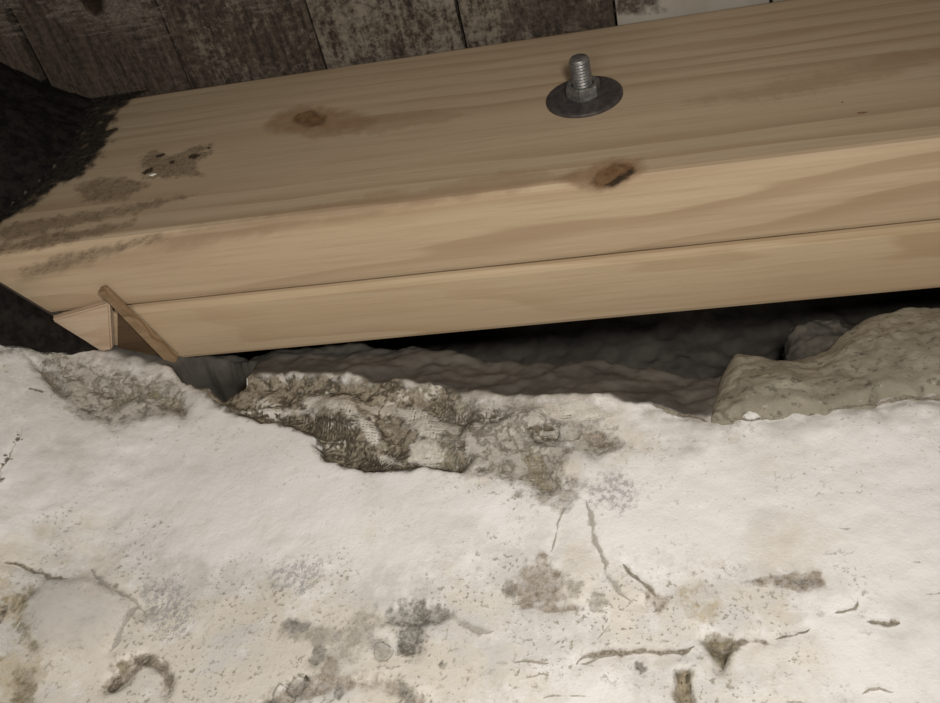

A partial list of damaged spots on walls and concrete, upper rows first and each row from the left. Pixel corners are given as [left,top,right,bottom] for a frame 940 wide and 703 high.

damp [615,0,657,13]
crack [0,424,25,481]
spalling [201,373,621,512]
crack [5,562,68,579]
crack [91,569,158,651]
crack [586,500,656,602]
damp [264,601,494,703]